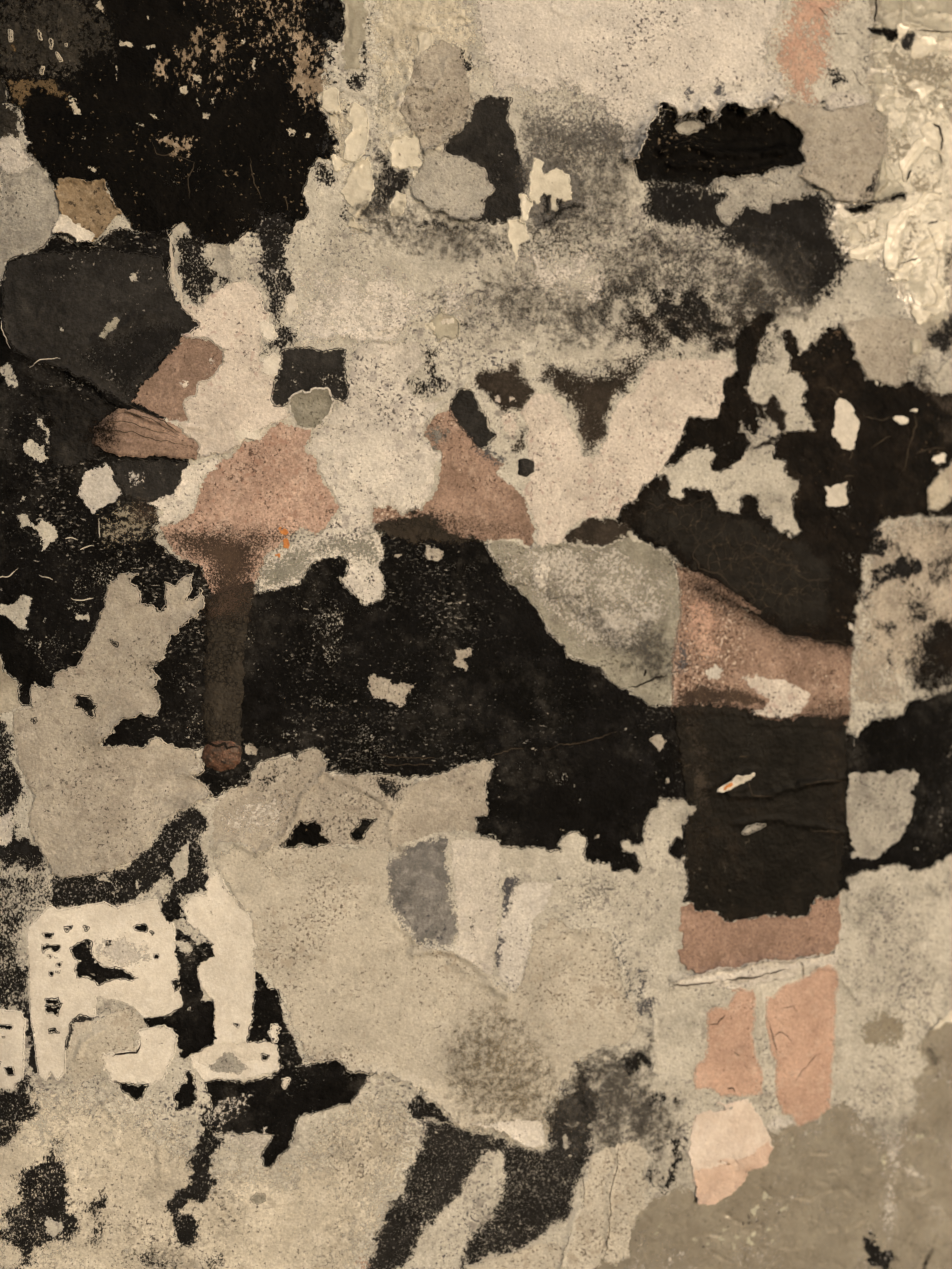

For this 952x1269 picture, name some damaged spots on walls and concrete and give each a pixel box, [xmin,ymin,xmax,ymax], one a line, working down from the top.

peeling [675,113,705,135]
peeling [823,0,952,330]
peeling [135,841,190,902]
peeling [198,1041,264,1075]